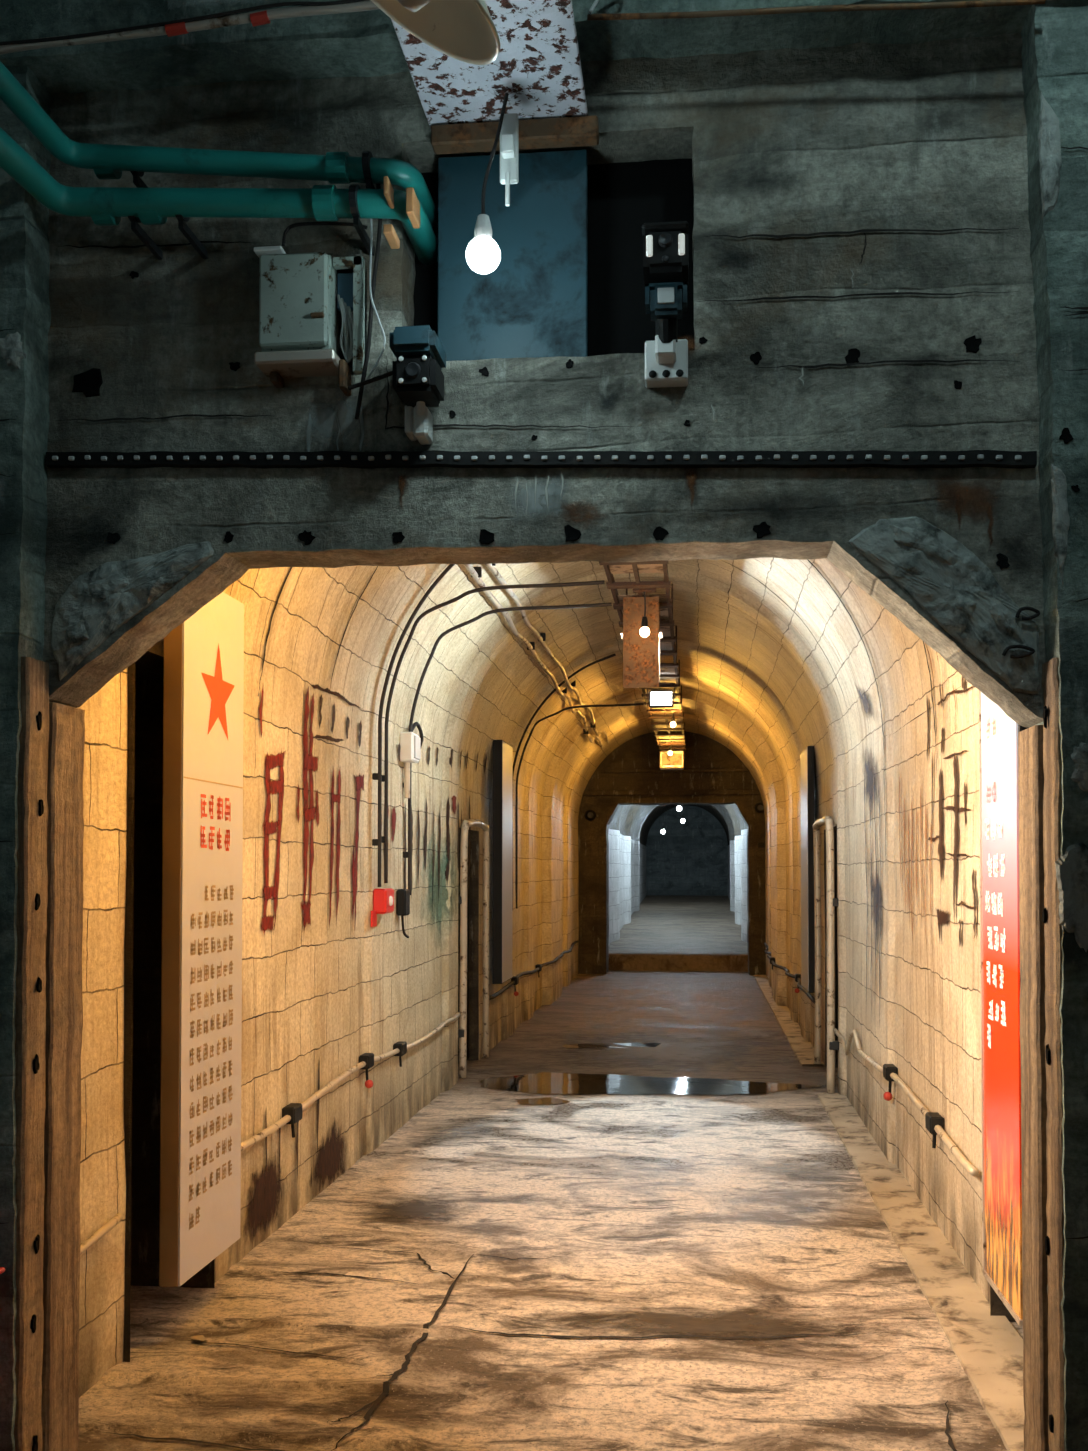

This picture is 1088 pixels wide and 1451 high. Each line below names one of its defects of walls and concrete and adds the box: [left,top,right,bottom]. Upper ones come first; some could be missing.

damp [815,570,883,736]
spalling [1071,742,1088,791]
damp [864,753,882,1017]
spalling [1055,842,1088,952]
crack [185,1245,889,1451]
crack [95,1431,285,1451]
crack [945,1400,957,1451]